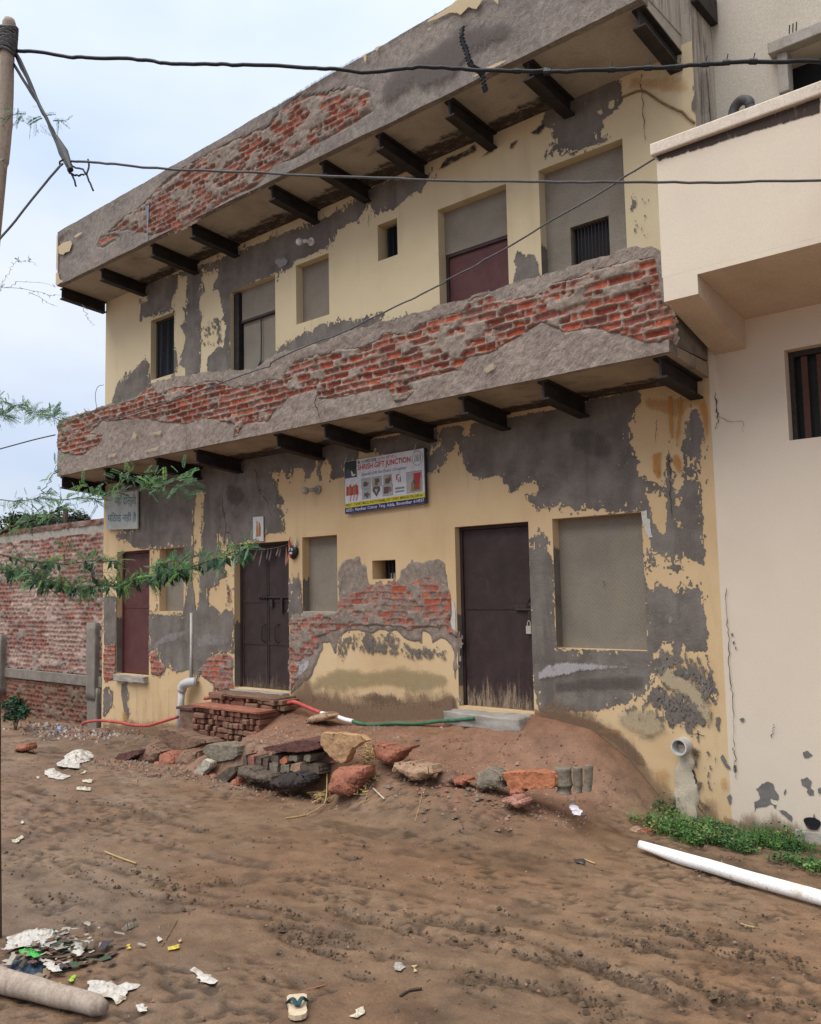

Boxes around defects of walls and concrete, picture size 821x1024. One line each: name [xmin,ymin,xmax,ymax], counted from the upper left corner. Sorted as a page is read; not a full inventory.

flaking render [96,85,374,248]
flaking render [541,79,623,160]
flaking render [56,167,680,456]
flaking render [109,390,737,791]
crack [725,587,737,778]
flaking render [754,782,792,821]
flaking render [801,777,821,796]